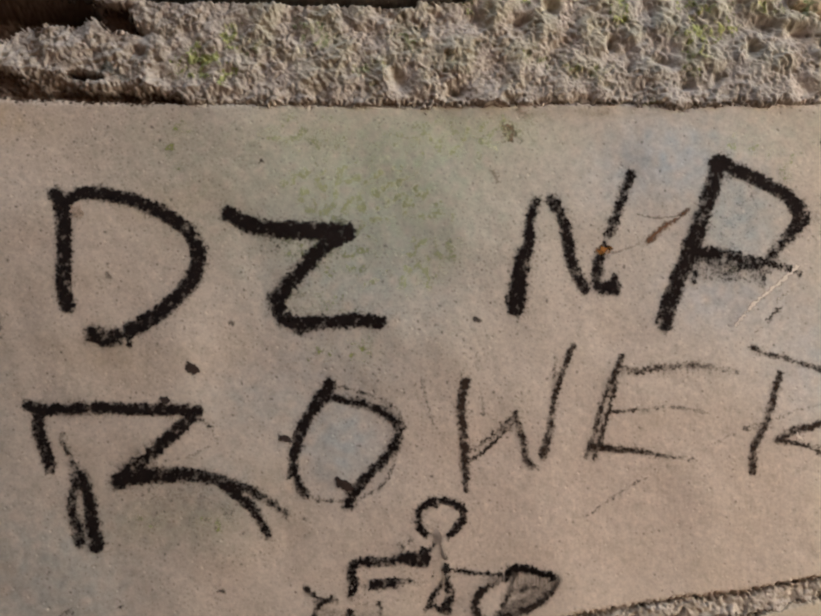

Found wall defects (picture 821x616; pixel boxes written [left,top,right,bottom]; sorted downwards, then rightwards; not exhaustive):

spalling [0,0,139,41]
spalling [0,71,186,107]
corrosion [646,209,690,244]